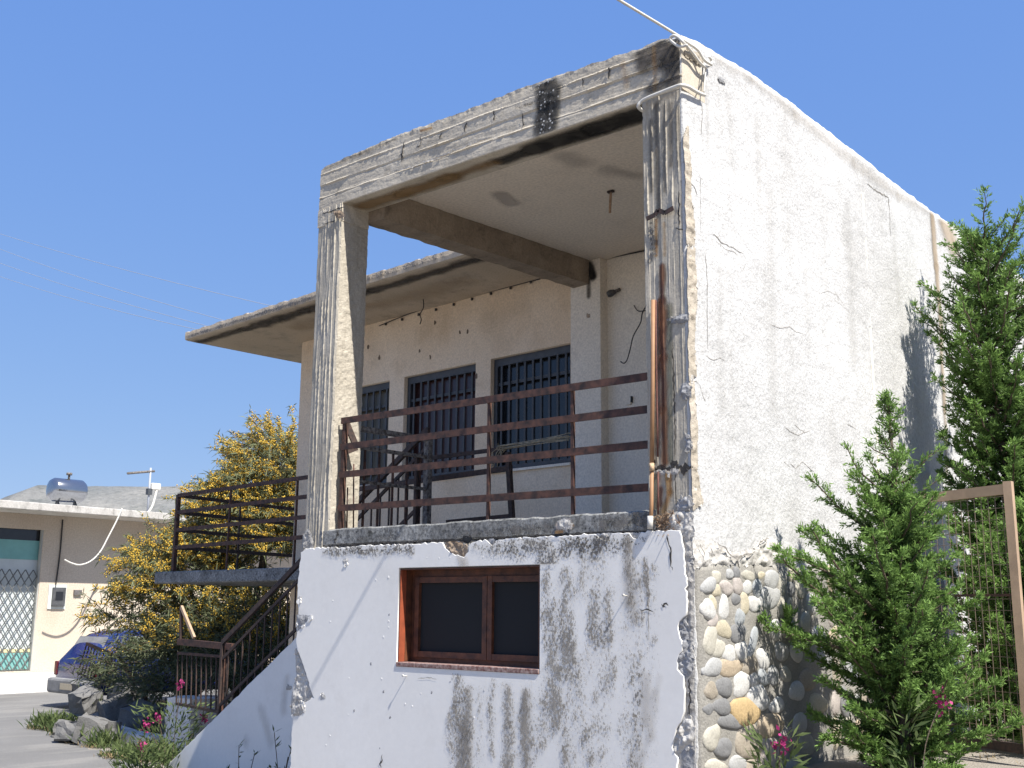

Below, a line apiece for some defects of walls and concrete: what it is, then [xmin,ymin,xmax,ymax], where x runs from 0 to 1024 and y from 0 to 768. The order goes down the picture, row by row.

water stain [515,79,561,135]
water stain [355,161,498,209]
crack [705,234,744,361]
spalling [655,126,792,768]
spalling [443,535,473,557]
spalling [296,596,313,631]
water stain [445,473,658,768]
spalling [286,648,325,717]